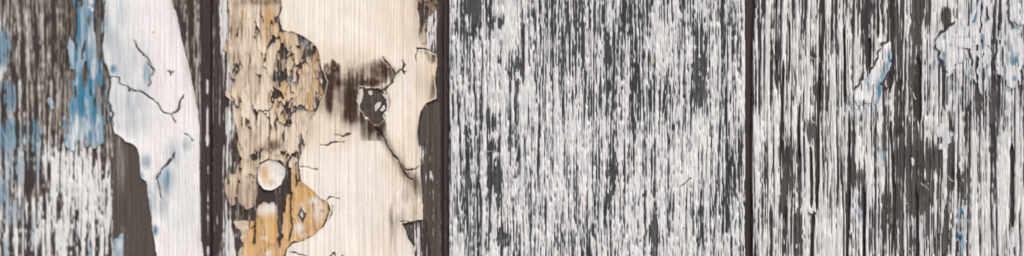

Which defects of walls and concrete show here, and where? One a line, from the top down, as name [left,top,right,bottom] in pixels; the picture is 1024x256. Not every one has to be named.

crack [102,42,193,199]
peeling [222,0,329,256]
peeling [357,86,390,124]
crack [370,48,433,91]
peeling [416,0,438,48]
peeling [854,41,893,105]
peeling [935,0,1024,94]
peeling [112,132,157,256]
peeling [404,101,441,256]